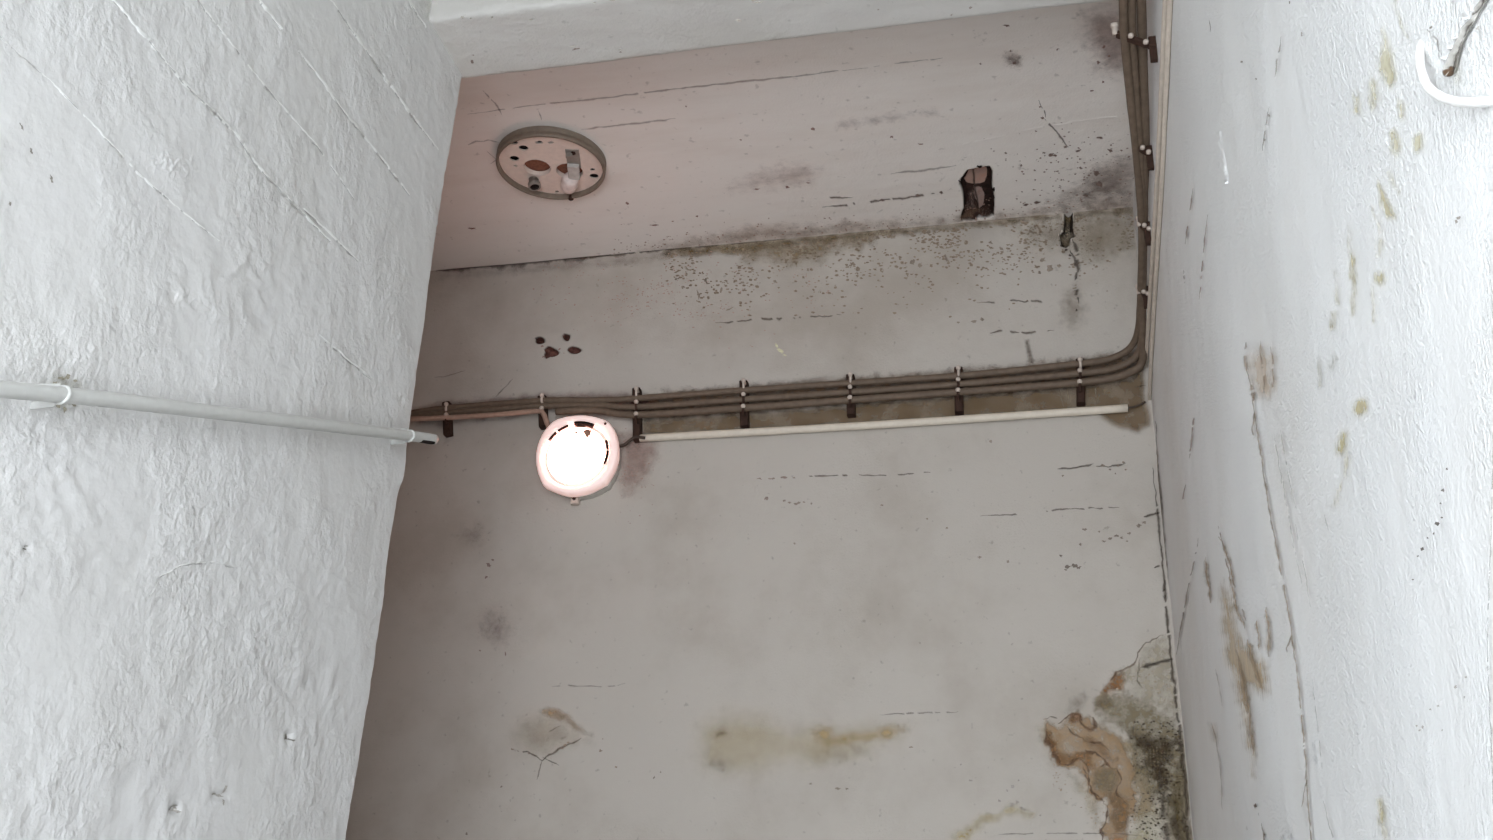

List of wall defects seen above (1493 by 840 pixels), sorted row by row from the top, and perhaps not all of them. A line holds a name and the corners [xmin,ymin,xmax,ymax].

water stain [1016,122,1134,210]
peeling [533,165,1134,348]
water stain [1104,697,1192,840]